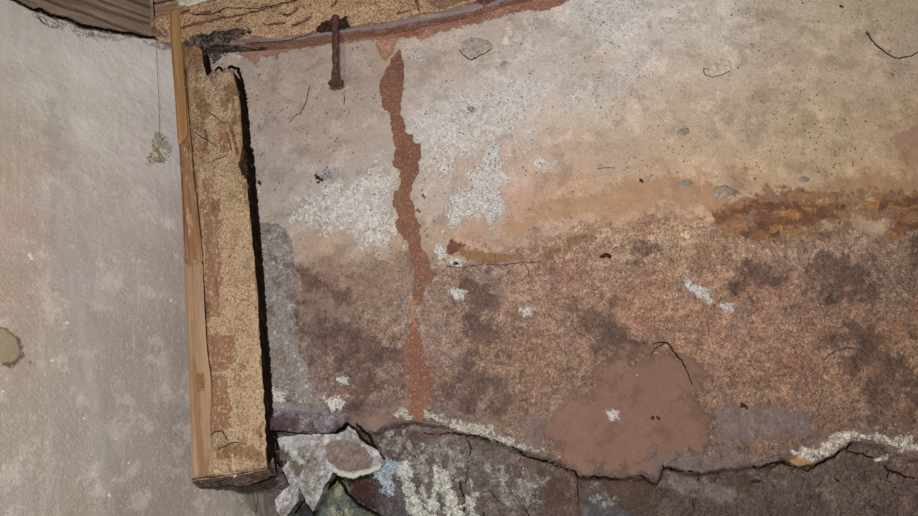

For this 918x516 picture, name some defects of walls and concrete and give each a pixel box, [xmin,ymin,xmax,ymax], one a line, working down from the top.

corrosion [238,0,569,424]
corrosion [712,184,918,244]
corrosion [544,234,587,258]
damp [288,62,918,516]
damp [0,328,24,367]
spalling [252,407,918,516]
crack [336,473,381,516]